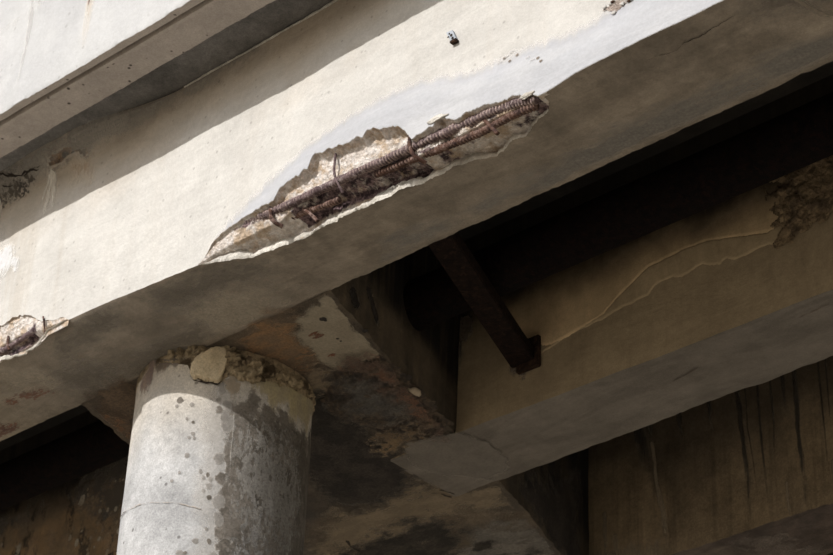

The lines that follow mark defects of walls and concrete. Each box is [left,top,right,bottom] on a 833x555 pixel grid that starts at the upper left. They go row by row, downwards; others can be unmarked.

peeling [603,0,631,15]
crack [0,166,39,187]
leakage [0,100,162,209]
spalling [198,90,549,265]
flaking render [501,155,833,353]
spalling [0,315,69,363]
peeling [190,346,227,385]
leakage [309,391,419,505]
leakage [339,516,474,555]